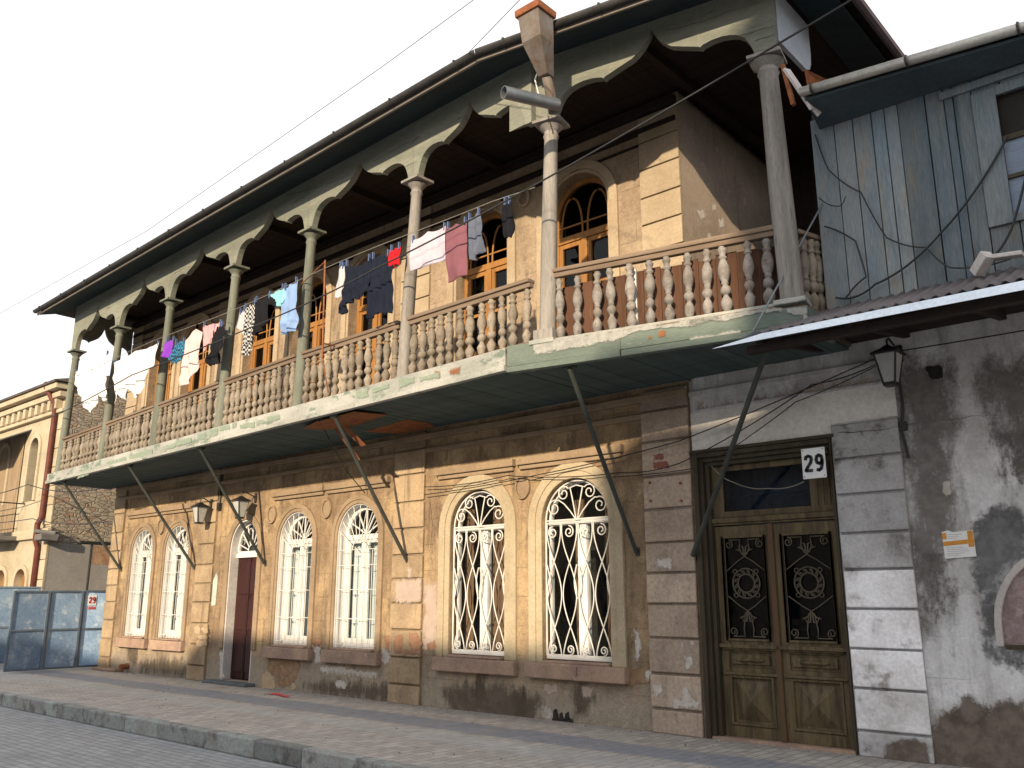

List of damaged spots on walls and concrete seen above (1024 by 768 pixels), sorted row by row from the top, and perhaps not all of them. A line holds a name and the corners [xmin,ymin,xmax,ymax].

peeling [533,307,808,354]
leakage [976,357,1024,484]
peeling [655,557,679,584]
leakage [972,507,1024,667]
peeling [633,629,642,661]
leakage [444,675,539,718]
leakage [551,684,589,723]
peeling [673,688,700,709]
leakage [884,695,1024,768]